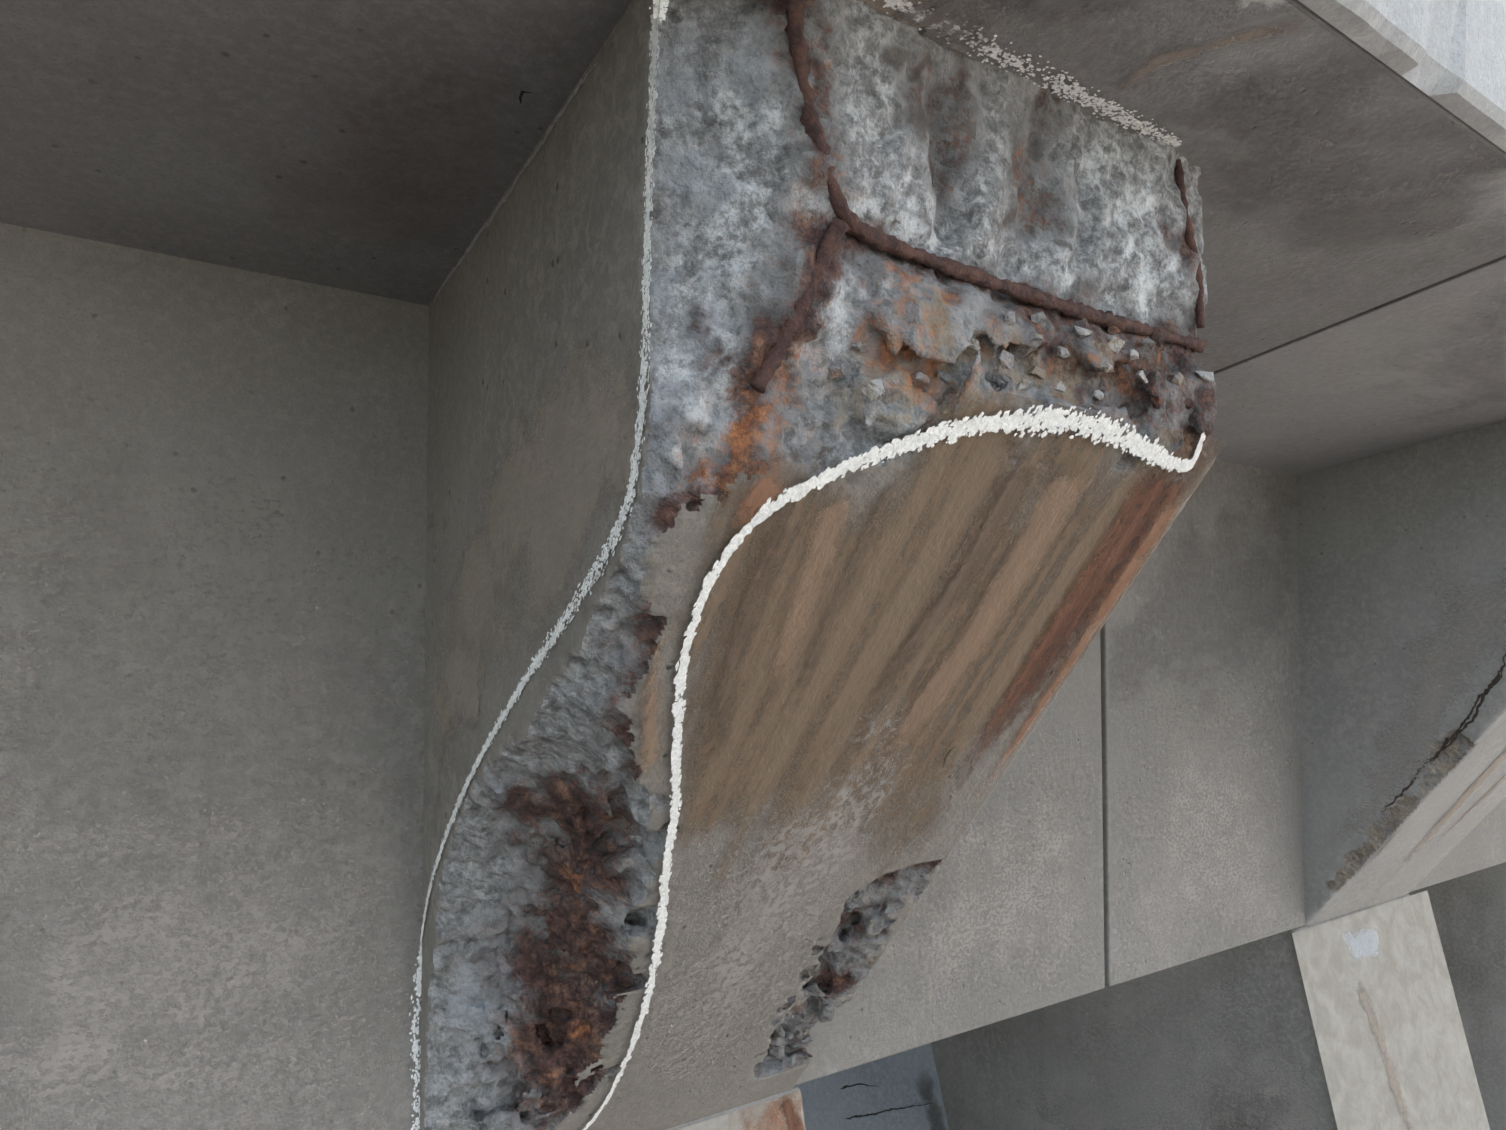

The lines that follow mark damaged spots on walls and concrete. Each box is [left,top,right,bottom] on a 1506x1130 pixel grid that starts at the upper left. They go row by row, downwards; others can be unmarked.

spalling [424,0,1217,1130]
corrosion [681,390,1213,877]
crack [1380,653,1506,815]
corrosion [745,1094,805,1130]